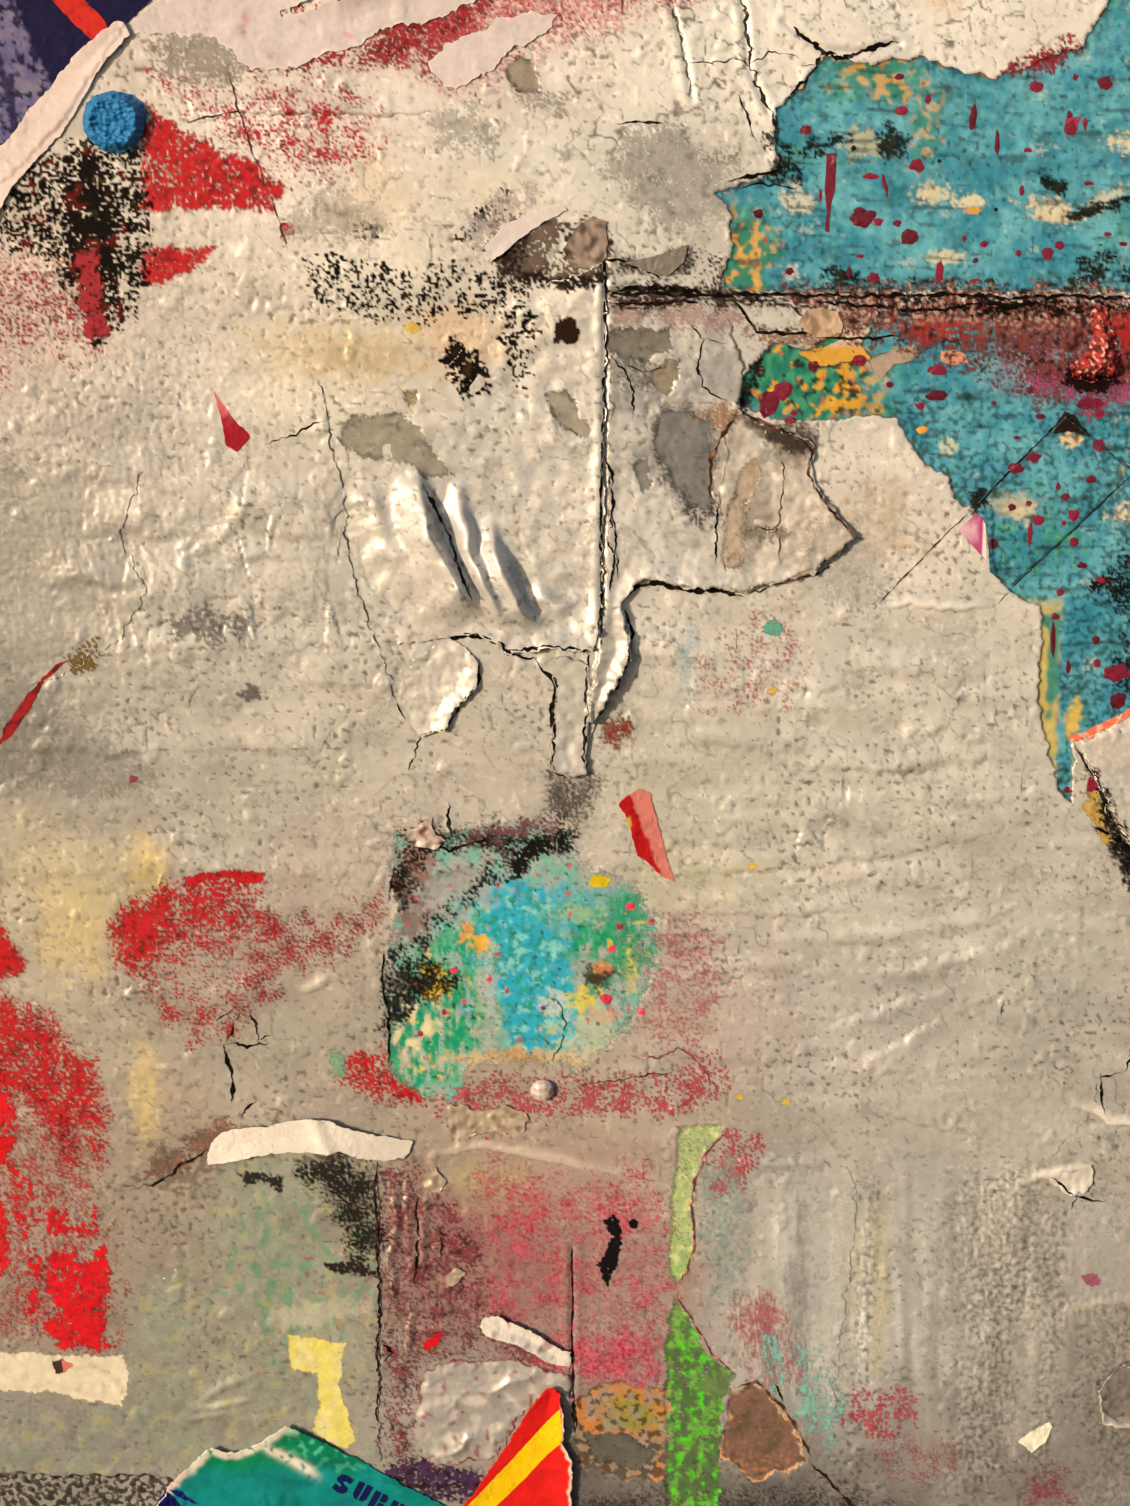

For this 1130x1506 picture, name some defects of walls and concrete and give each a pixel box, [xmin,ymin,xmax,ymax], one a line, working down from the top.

peeling [505,55,541,95]
peeling [714,0,1130,803]
crack [268,248,1130,778]
crack [1073,742,1130,864]
peeling [386,872,406,932]
peeling [589,875,611,888]
peeling [1090,1094,1130,1126]
crack [1100,1050,1130,1115]